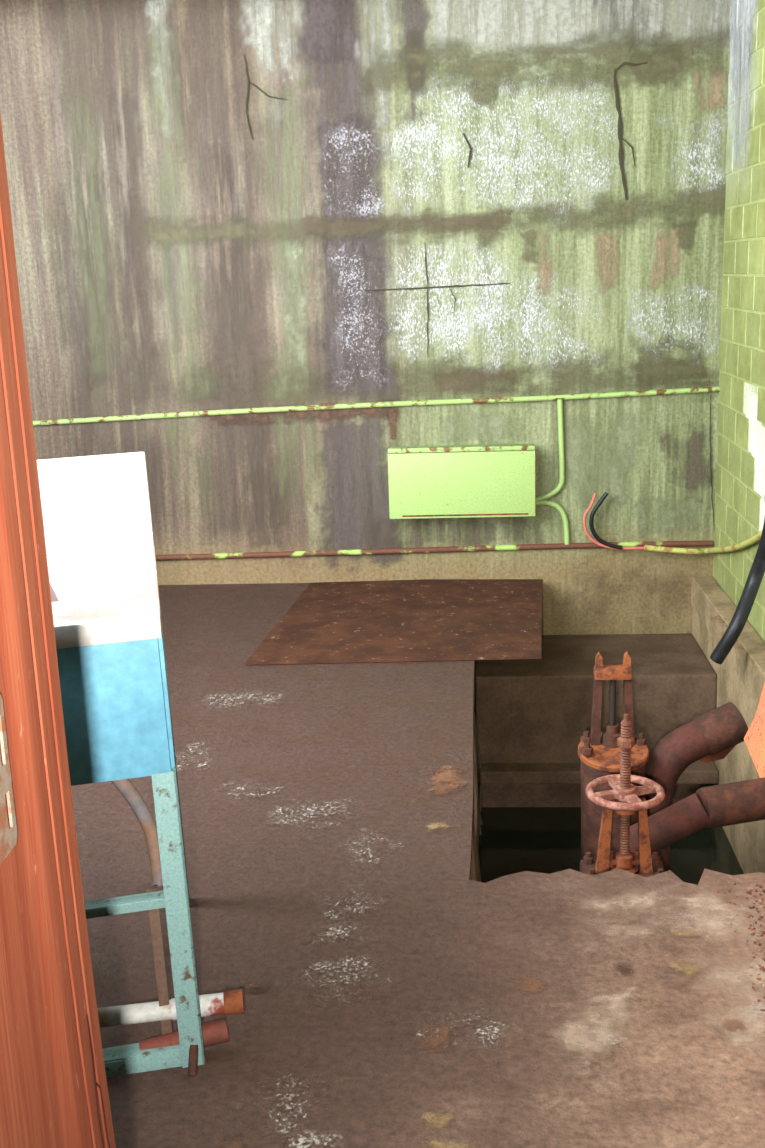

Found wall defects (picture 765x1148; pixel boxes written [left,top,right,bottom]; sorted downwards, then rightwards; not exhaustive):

crack [613,62,647,200]
water stain [674,33,749,193]
water stain [59,0,726,562]